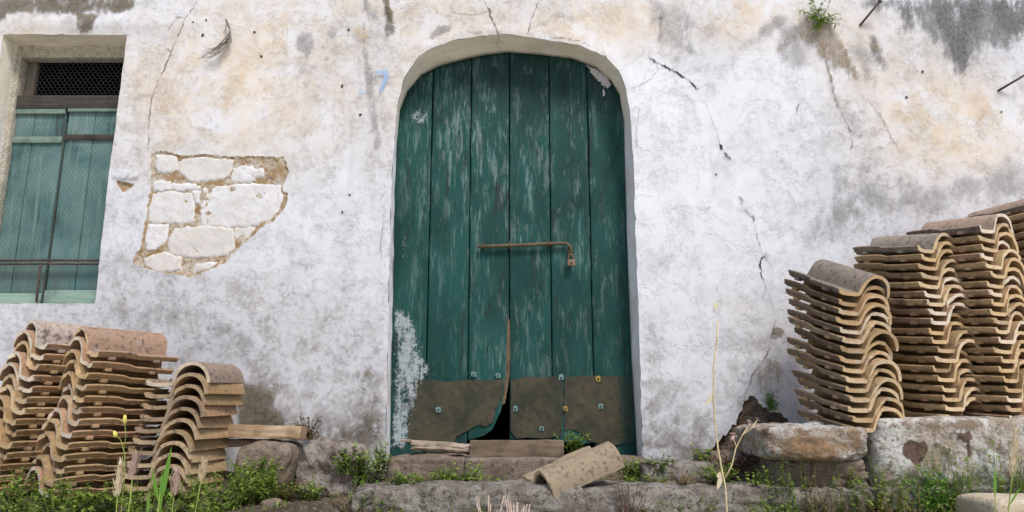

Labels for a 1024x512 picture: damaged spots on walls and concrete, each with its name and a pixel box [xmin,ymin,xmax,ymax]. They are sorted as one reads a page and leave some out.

leakage [0,0,135,33]
crack [148,9,191,149]
leakage [362,39,381,147]
leakage [364,0,395,37]
crack [634,57,731,160]
crack [824,56,853,159]
leakage [866,0,1024,73]
flaking render [111,151,289,277]
crack [688,196,779,398]
flaking render [711,396,789,451]